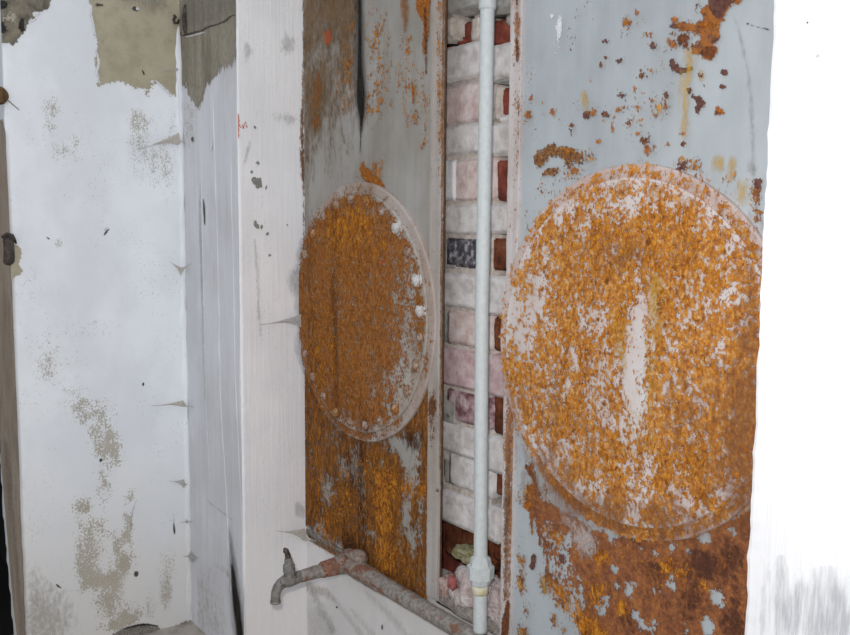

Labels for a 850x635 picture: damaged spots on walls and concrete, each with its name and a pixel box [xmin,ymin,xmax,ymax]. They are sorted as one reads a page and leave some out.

flaking render [0,0,51,46]
peeling [89,0,236,107]
corrosion [299,0,446,601]
corrosion [498,0,763,635]